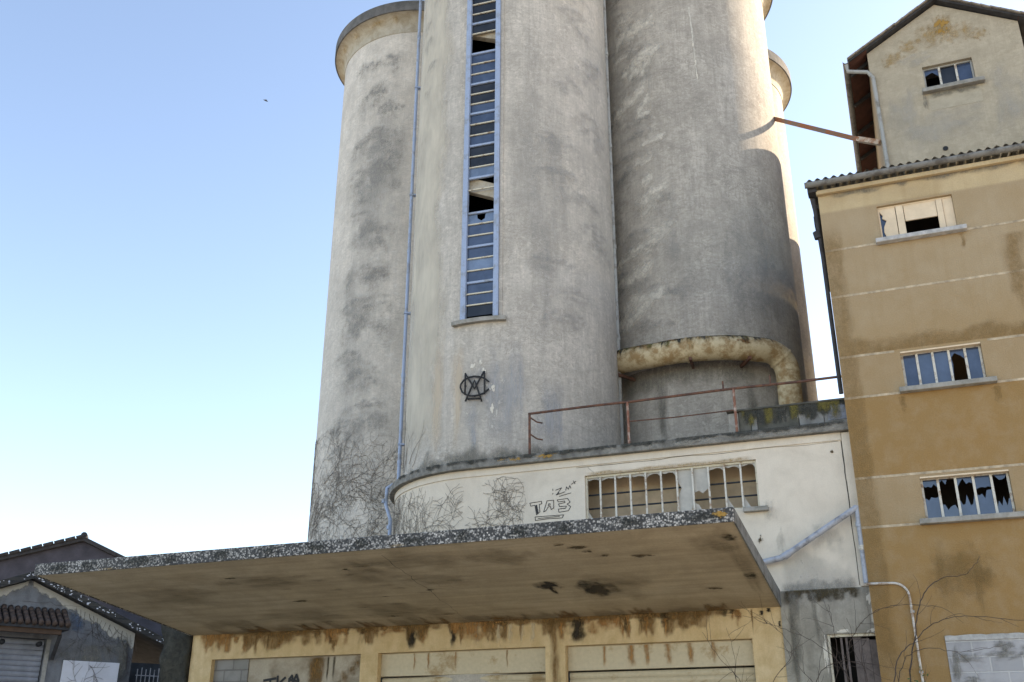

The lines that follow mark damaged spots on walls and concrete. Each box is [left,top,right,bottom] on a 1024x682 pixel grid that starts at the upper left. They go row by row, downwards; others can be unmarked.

leakage [627,360,747,396]
leakage [202,609,753,682]